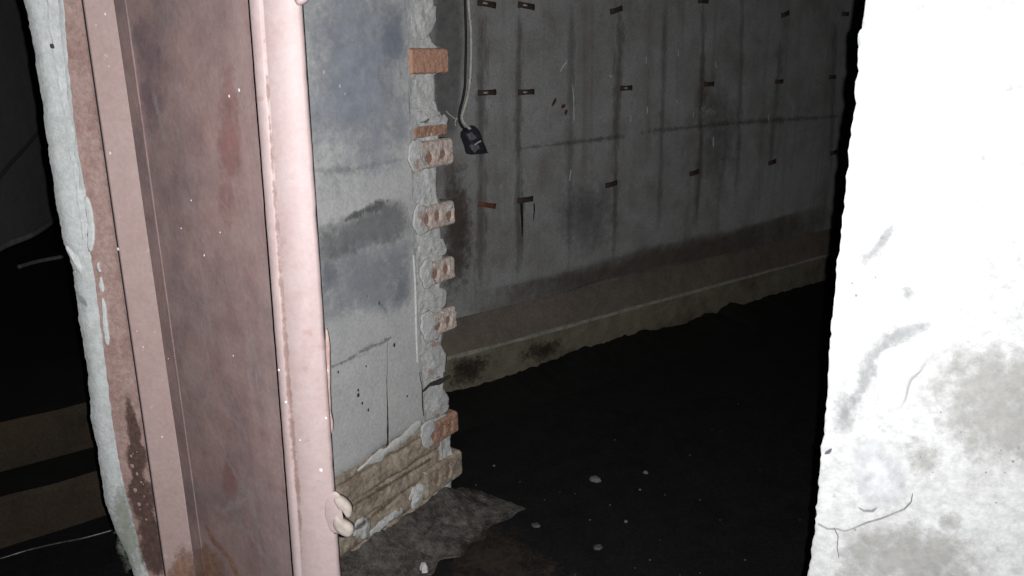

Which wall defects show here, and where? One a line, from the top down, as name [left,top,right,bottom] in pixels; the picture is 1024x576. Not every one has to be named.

spalling [335,0,462,557]
damp [446,181,469,276]
damp [530,218,797,296]
damp [450,360,485,384]
corrosion [126,399,238,576]
crack [818,494,913,557]